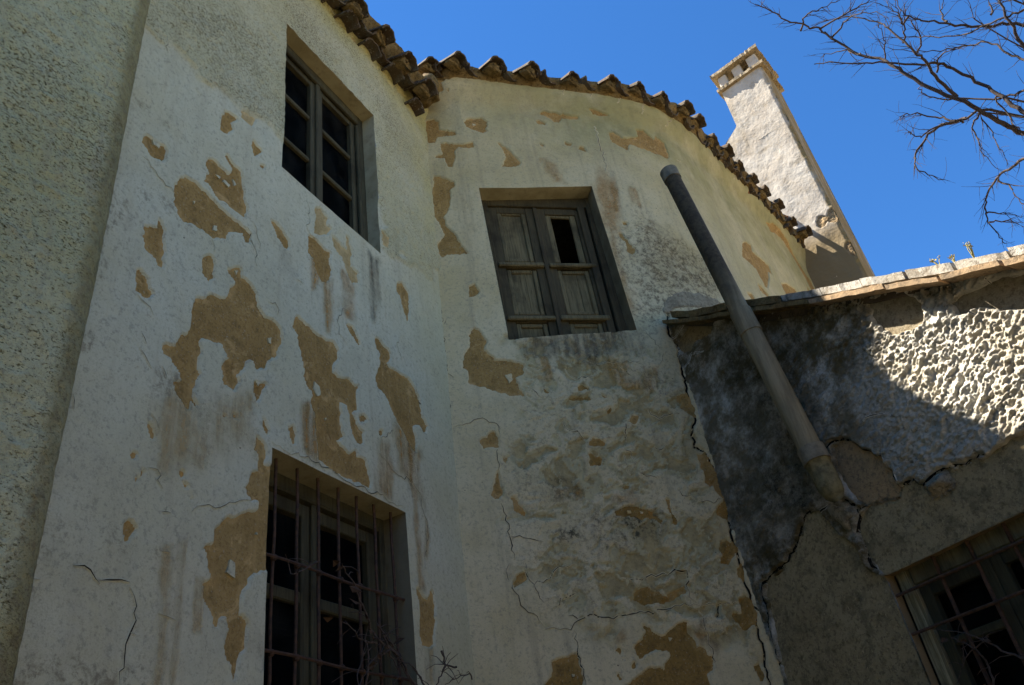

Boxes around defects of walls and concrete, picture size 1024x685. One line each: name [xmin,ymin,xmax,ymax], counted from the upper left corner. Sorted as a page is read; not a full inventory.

peeling [173,155,250,243]
peeling [162,268,370,488]
peeling [375,339,427,452]
peeling [463,329,524,397]
crack [667,316,714,468]
crack [826,438,984,497]
crack [73,564,138,685]
peeling [203,421,270,679]
crack [498,499,719,685]
peeling [617,622,713,685]
crack [679,490,877,685]
spalling [766,435,1024,685]